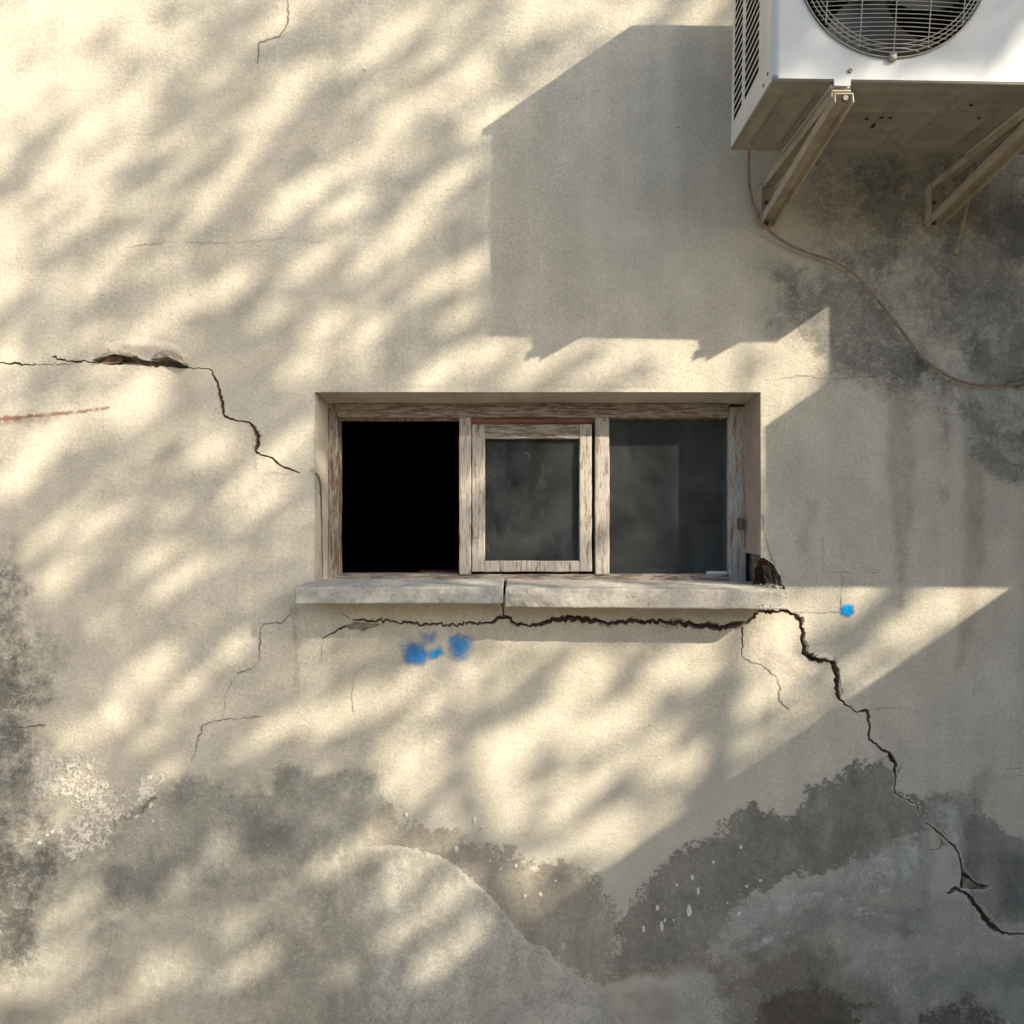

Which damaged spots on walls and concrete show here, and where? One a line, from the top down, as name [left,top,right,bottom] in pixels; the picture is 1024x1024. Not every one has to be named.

crack [257,0,290,65]
crack [0,356,95,366]
corrosion [0,407,107,421]
crack [186,367,324,580]
damp [775,271,933,385]
damp [818,164,1024,388]
damp [0,570,74,967]
crack [191,534,1024,978]
damp [98,758,1024,1024]